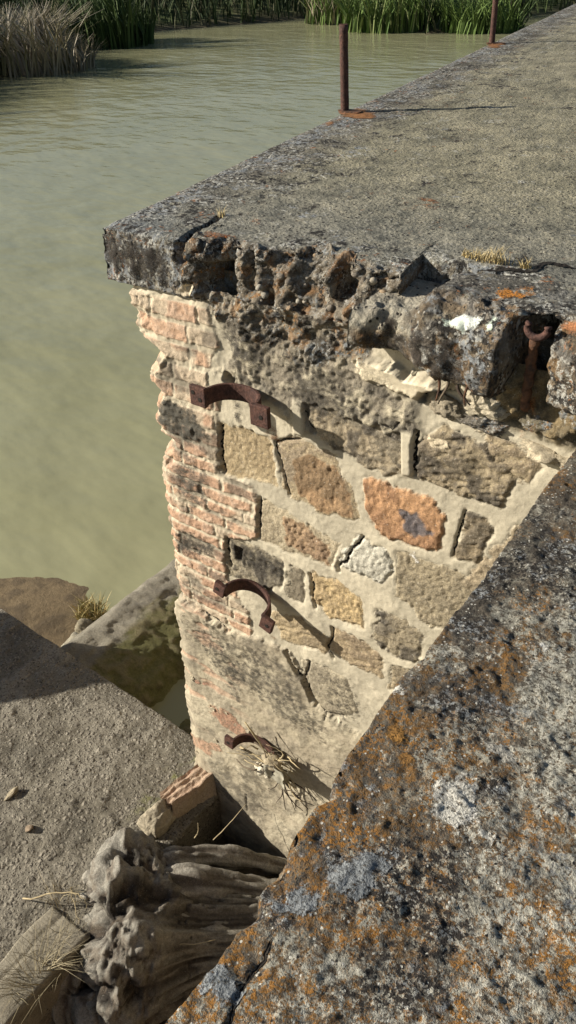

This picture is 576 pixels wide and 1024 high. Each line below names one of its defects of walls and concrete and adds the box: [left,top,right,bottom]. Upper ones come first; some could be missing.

spalling [176,234,423,325]
crack [478,261,574,272]